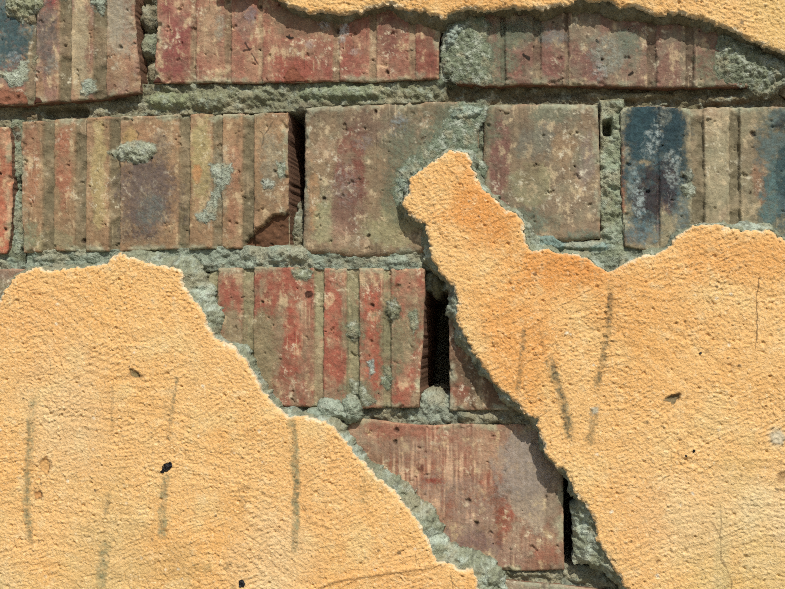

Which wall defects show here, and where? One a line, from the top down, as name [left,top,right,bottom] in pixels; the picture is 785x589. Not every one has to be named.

peeling [443,23,464,49]
peeling [760,58,785,99]
spalling [0,90,42,105]
peeling [451,105,484,119]
spalling [247,213,290,247]
peeling [367,359,393,391]
peeling [349,379,377,406]